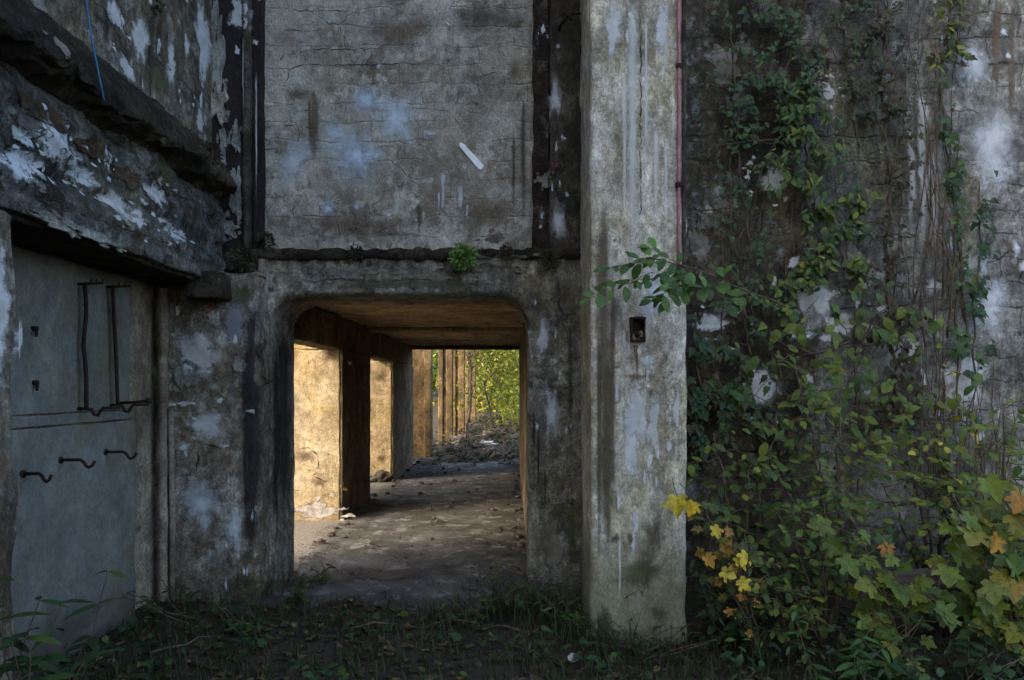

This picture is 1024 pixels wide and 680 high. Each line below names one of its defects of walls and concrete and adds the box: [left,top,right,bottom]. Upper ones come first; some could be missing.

spalling [0,88,195,252]
peeling [107,0,249,242]
damp [290,89,318,152]
crack [265,9,438,150]
peeling [963,51,983,78]
peeling [976,114,1012,188]
peeling [965,242,1024,326]
peeling [171,332,220,375]
peeling [169,398,241,483]
peeling [615,330,683,489]
peeling [225,513,240,548]
spalling [294,493,355,521]